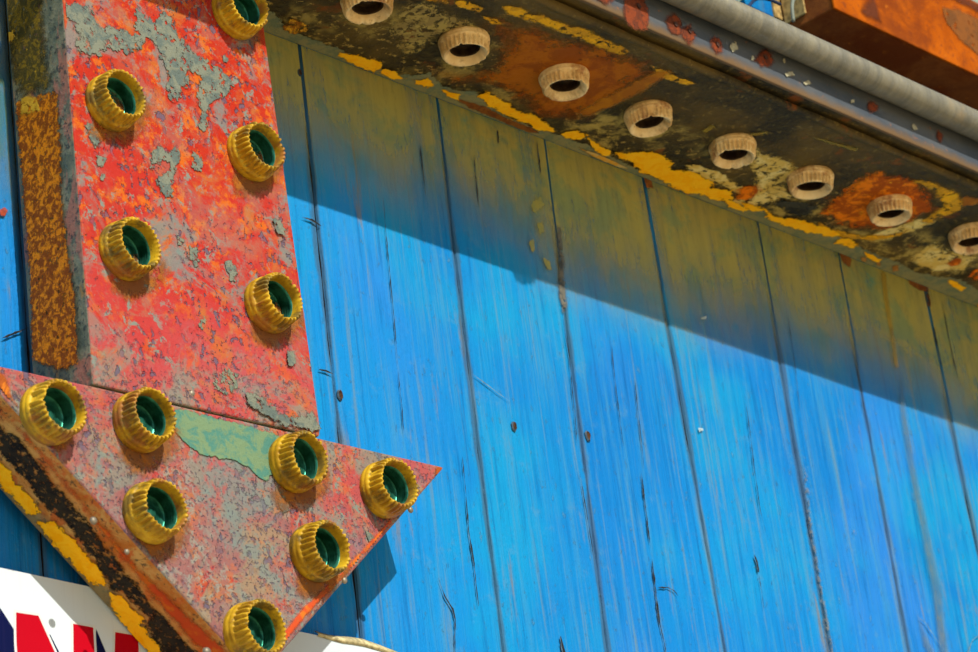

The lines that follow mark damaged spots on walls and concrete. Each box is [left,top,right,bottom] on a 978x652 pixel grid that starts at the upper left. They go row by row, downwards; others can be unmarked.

peeling [428,0,501,24]
peeling [503,6,629,55]
rust [599,0,649,30]
rust [665,13,696,45]
rust [863,0,880,20]
rust [943,0,978,54]
peeling [338,52,461,100]
rust [478,22,668,117]
peeling [652,66,694,85]
peeling [476,90,962,262]
rust [820,172,932,229]
peeling [529,197,567,312]